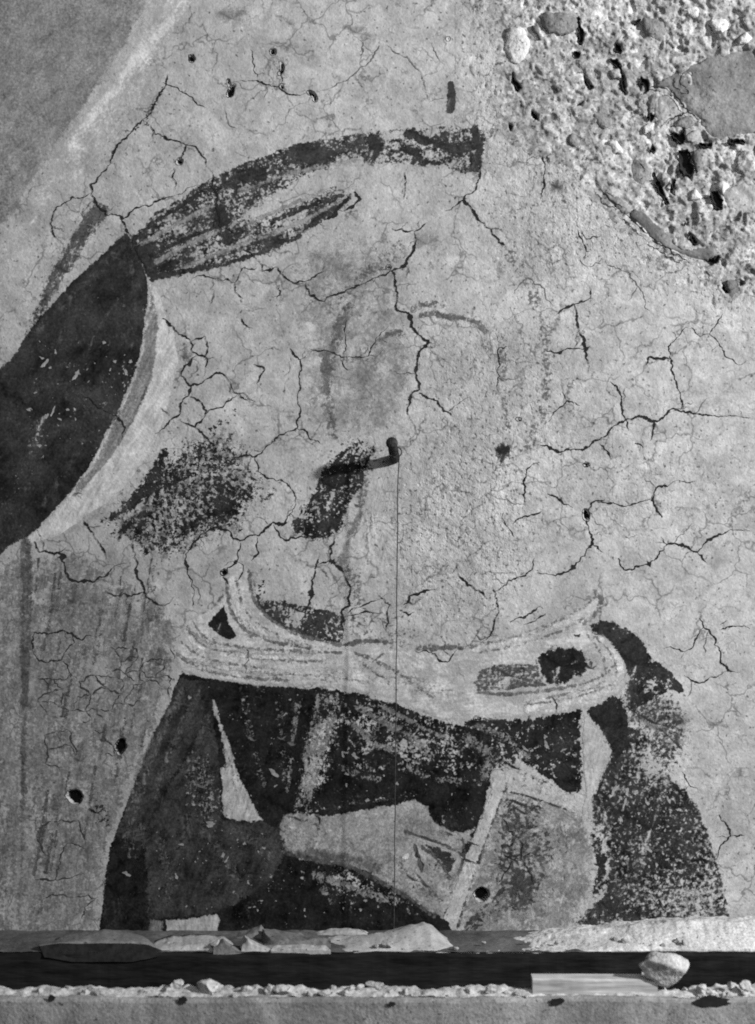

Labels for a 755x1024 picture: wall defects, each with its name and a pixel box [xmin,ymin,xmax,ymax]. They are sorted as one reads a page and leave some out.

crack [242,38,442,109]
crack [526,155,546,198]
spalling [485,0,755,303]
crack [35,75,510,639]
crack [454,231,750,641]
crack [416,638,455,662]
crack [666,619,750,695]
crack [31,629,175,767]
crack [35,819,95,921]
crack [499,819,541,884]
crack [717,815,744,858]